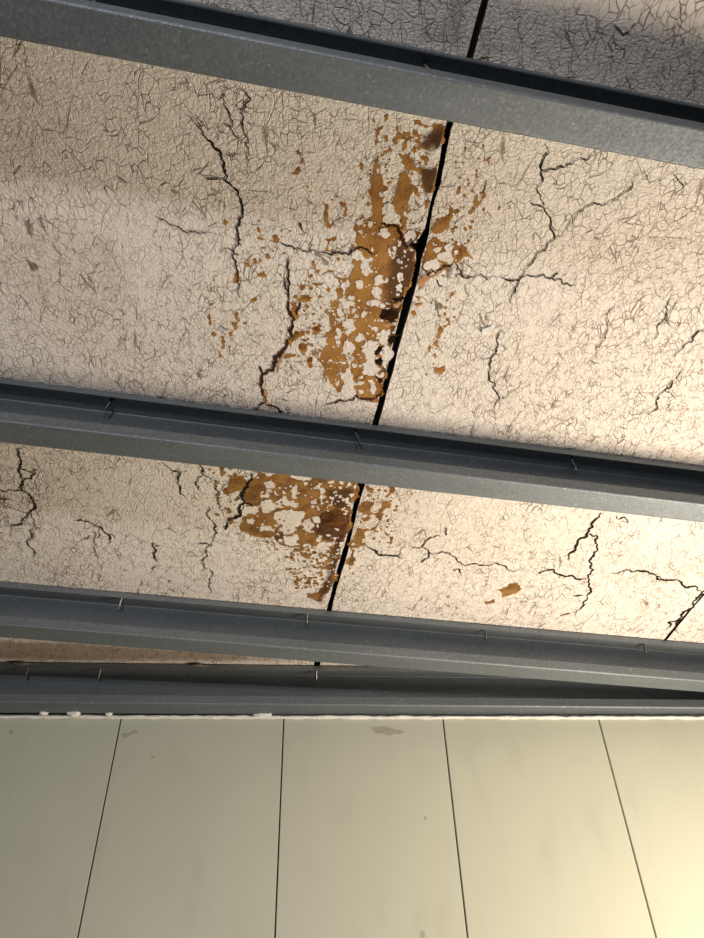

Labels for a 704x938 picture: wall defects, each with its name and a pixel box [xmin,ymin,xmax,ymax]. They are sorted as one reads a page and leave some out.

crack [155,85,256,297]
crack [251,223,384,413]
crack [381,223,417,248]
rust [388,233,419,347]
rust [422,169,436,192]
rust [424,130,443,148]
crack [482,330,513,409]
crack [421,145,639,307]
crack [0,445,37,558]
rust [315,517,343,596]
rust [329,490,350,506]
crack [366,513,704,629]